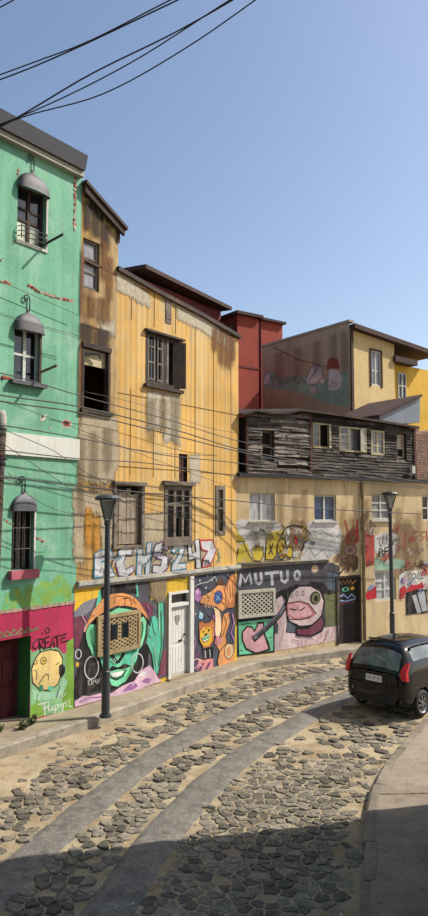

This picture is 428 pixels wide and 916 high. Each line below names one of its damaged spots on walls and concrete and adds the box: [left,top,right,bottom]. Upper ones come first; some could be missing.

rust [80,241,114,324]